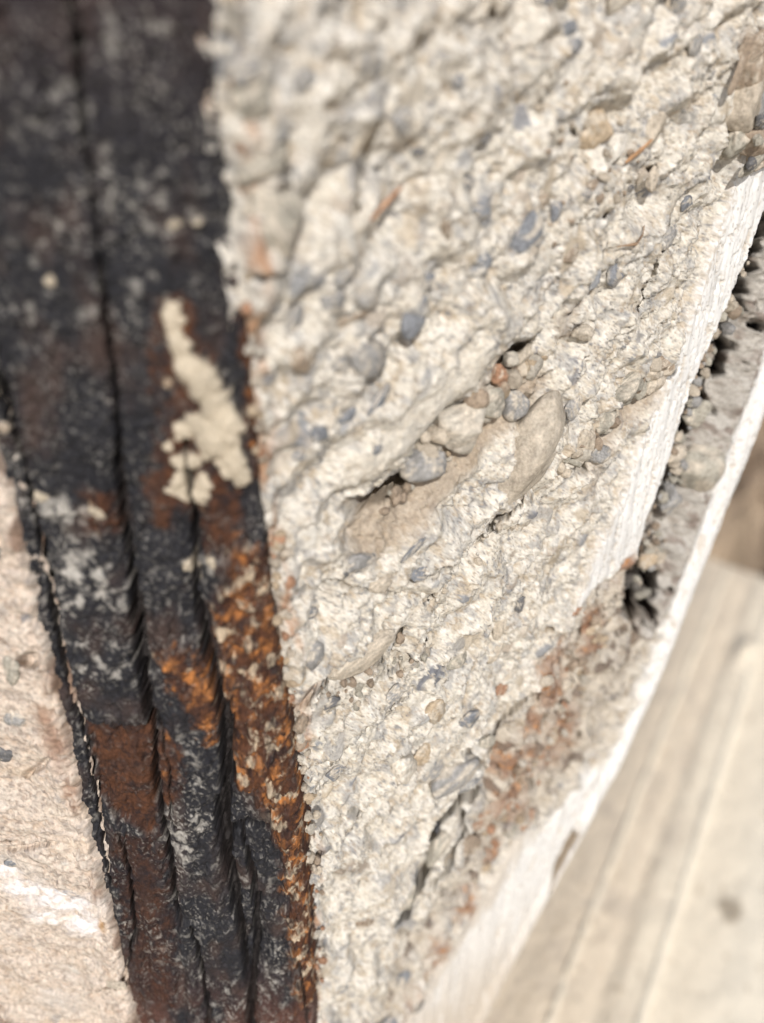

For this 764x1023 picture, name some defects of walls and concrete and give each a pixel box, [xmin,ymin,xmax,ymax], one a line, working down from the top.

spalling [0,394,13,434]
rust [79,486,132,537]
spalling [197,0,764,1023]
rust [613,552,639,583]
rust [141,293,319,1017]
rust [34,705,84,813]
spalling [0,452,141,1023]
rust [487,609,606,833]
rust [87,707,183,1010]
rust [424,936,454,976]
rust [455,883,480,925]
rust [482,836,500,865]